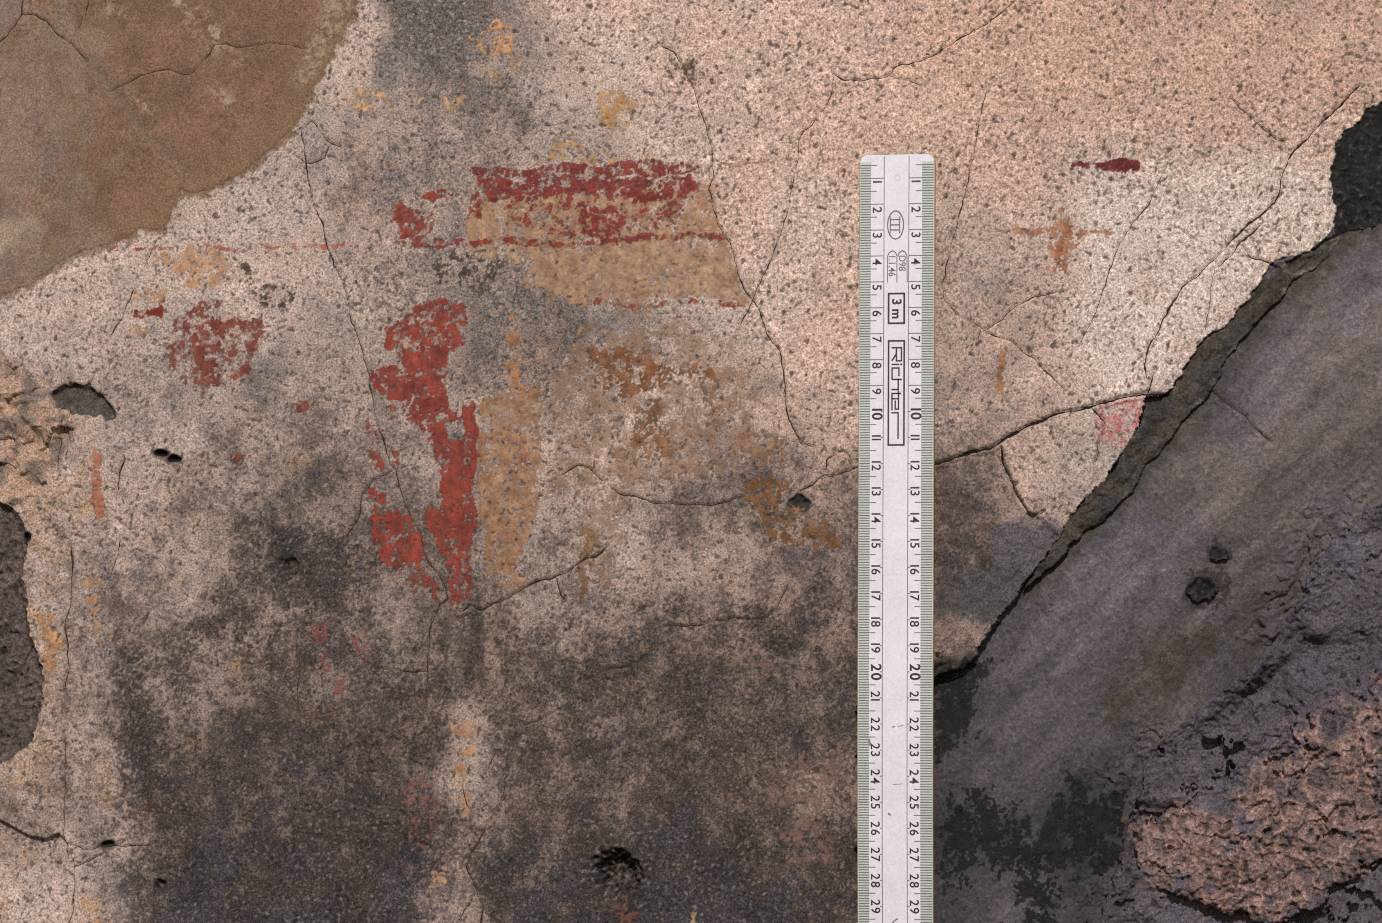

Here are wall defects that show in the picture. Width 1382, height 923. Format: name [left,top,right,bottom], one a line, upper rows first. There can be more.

peeling [265,242,345,250]
crack [661,1,1014,491]
peeling [1046,207,1083,272]
peeling [1095,157,1140,174]
crack [935,85,1360,517]
crack [297,121,608,700]
crack [562,465,744,506]
spalling [0,502,46,765]
water stain [113,515,858,923]
crack [667,586,788,627]
crack [372,751,506,923]